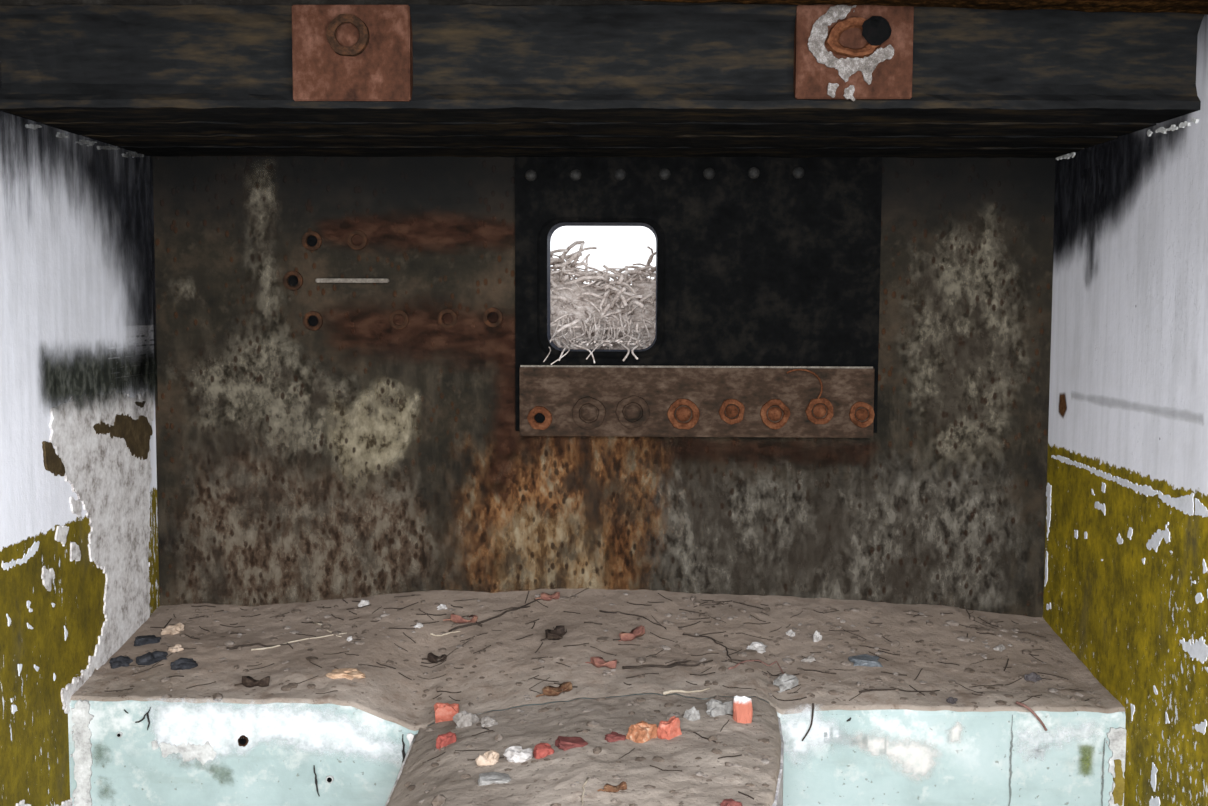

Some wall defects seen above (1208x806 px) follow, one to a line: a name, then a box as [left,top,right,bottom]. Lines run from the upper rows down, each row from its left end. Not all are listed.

peeling [808,5,894,101]
damp [41,349,158,410]
rust [458,320,660,593]
peeling [1,541,55,607]
peeling [42,391,154,806]
peeling [1044,483,1052,587]
peeling [1051,455,1208,564]
peeling [1191,559,1208,604]
peeling [1179,636,1208,672]
peeling [1106,703,1135,806]
peeling [1149,762,1160,806]
peeling [1195,719,1207,735]